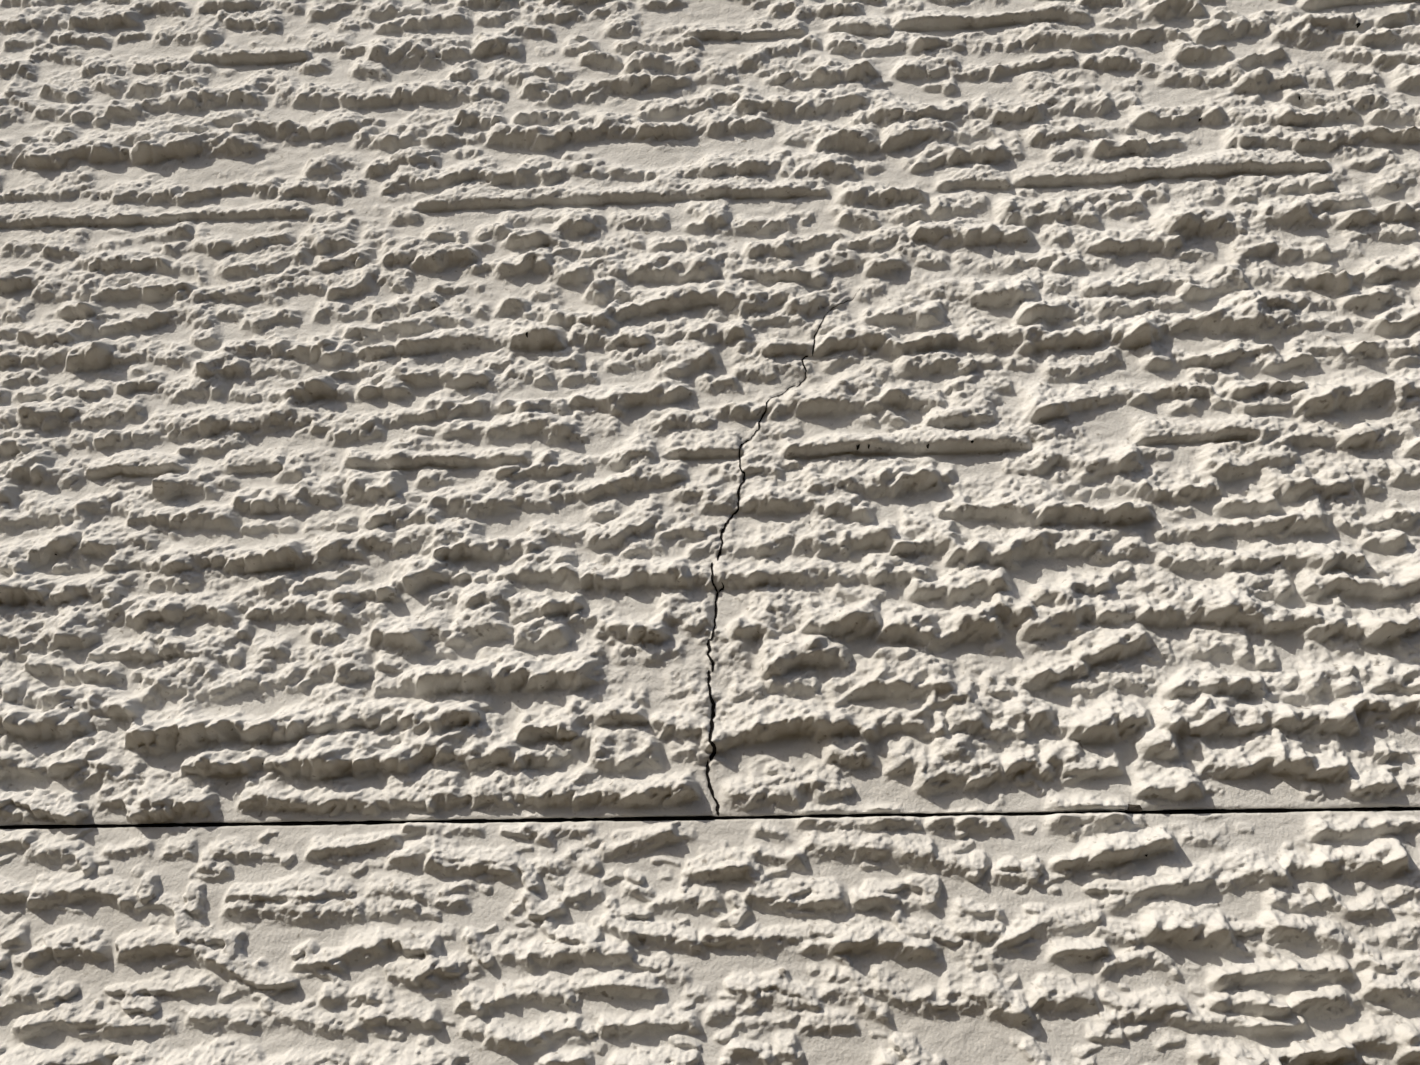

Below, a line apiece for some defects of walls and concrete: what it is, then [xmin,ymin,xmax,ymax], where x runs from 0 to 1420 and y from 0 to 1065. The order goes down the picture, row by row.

crack [706,289,860,816]